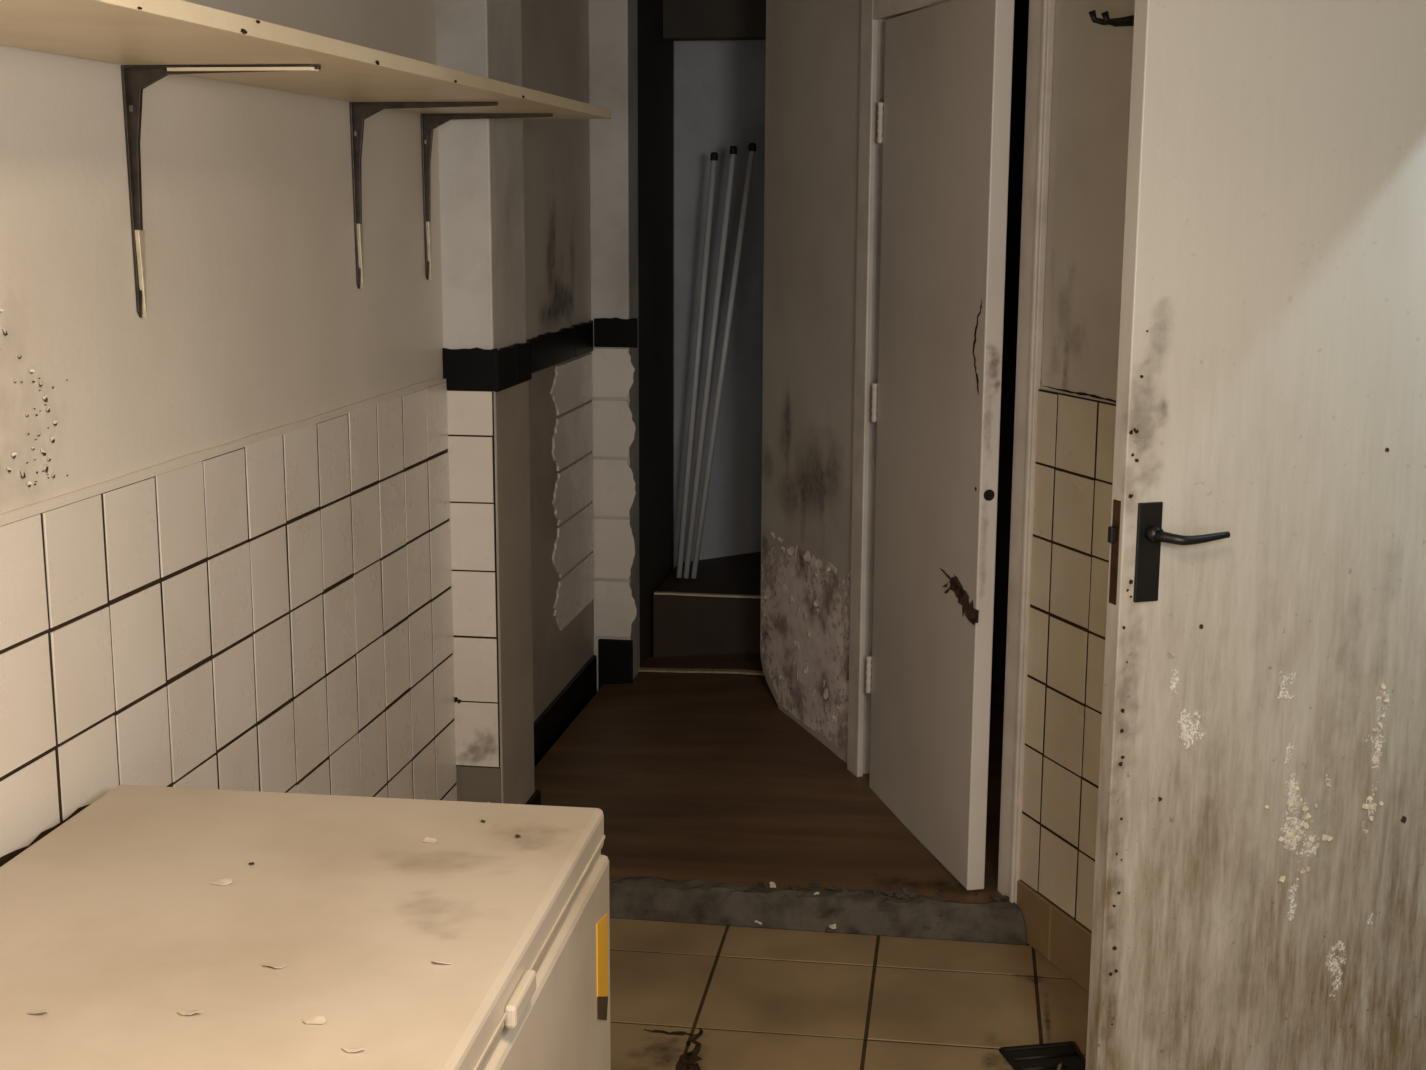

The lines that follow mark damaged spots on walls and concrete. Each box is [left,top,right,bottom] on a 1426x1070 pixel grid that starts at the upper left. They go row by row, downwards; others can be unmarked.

peeling [7,354,68,487]
crack [643,1028,703,1070]